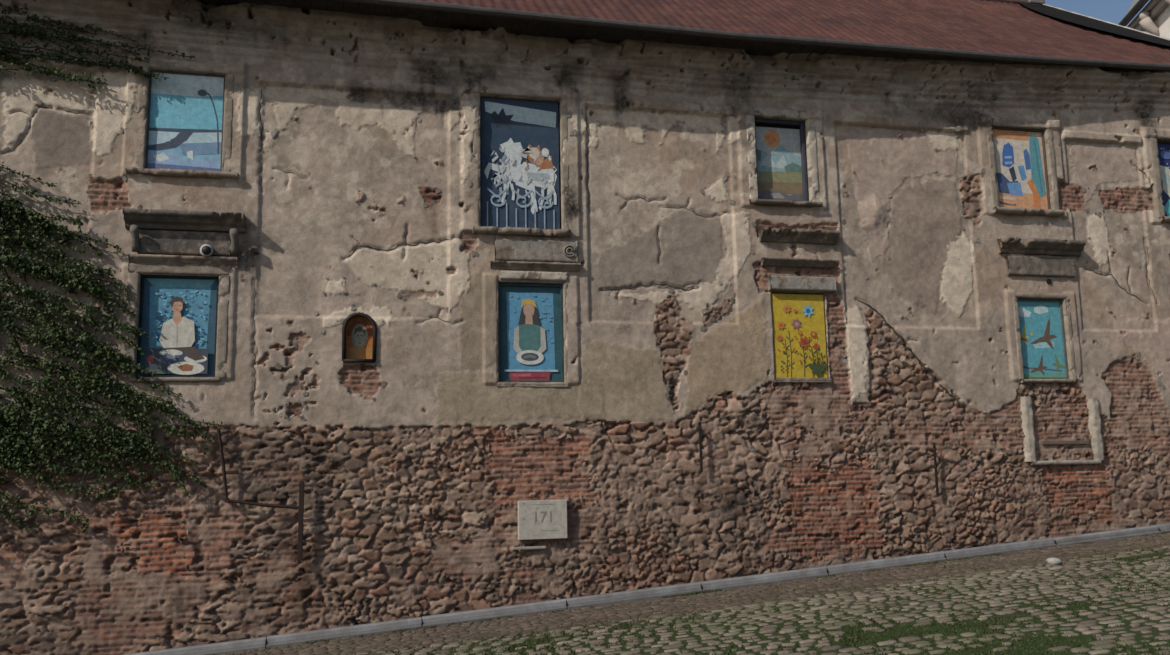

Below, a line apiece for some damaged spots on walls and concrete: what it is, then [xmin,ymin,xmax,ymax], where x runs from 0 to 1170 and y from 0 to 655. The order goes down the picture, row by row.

spalling [84,174,141,221]
peeling [255,231,478,421]
crack [344,225,459,259]
crack [600,195,729,295]
spalling [607,176,912,414]
spalling [1095,308,1170,432]
flaking render [1038,457,1112,521]